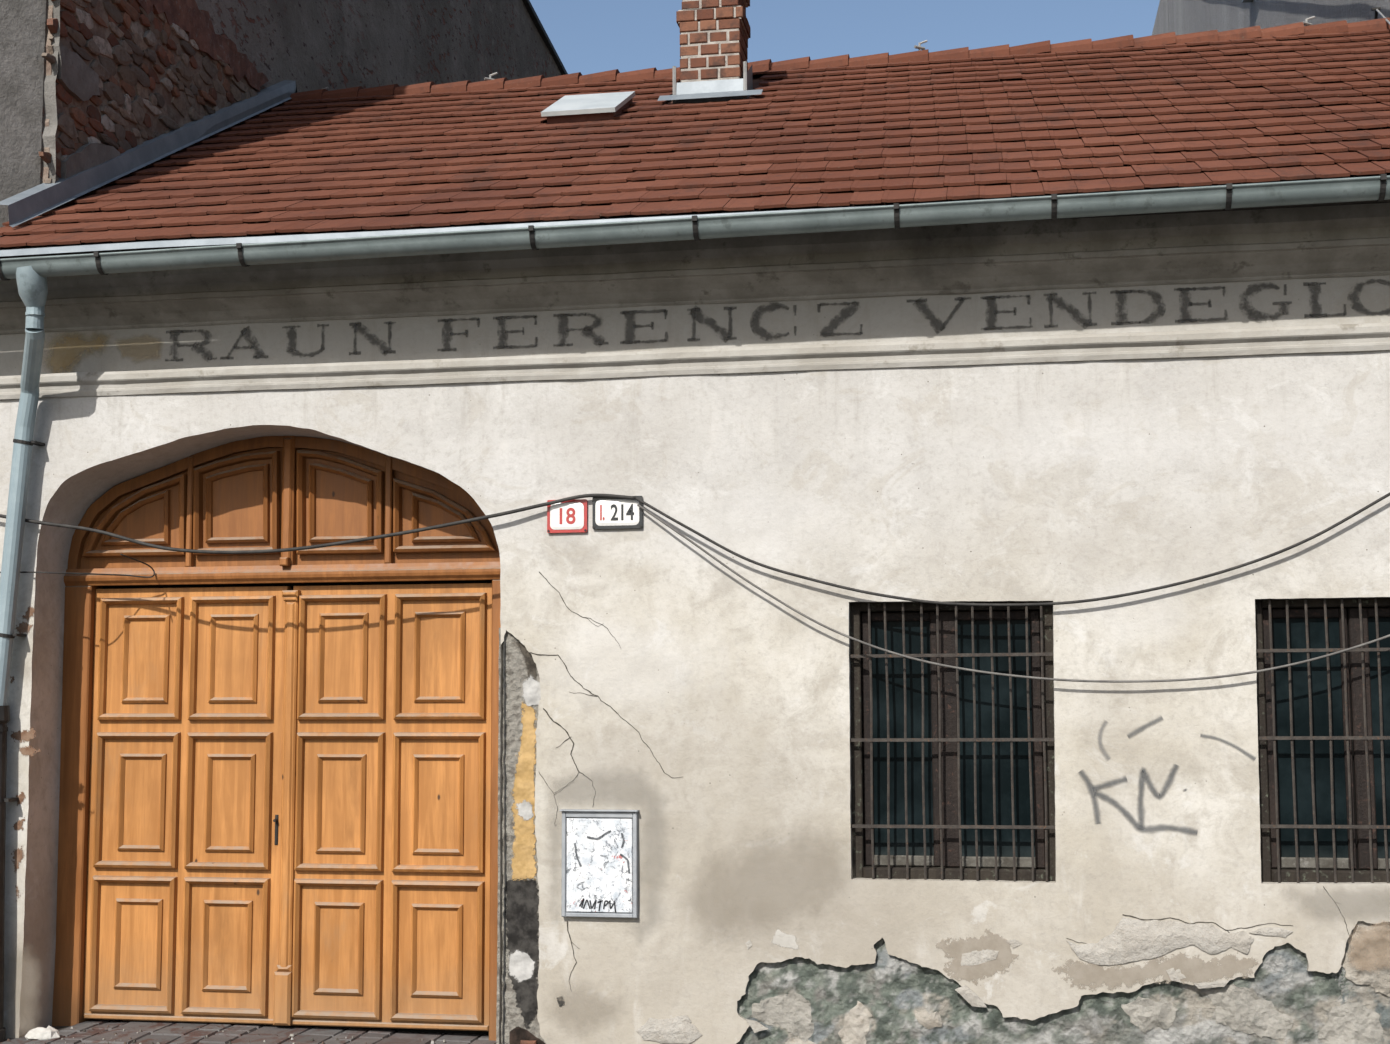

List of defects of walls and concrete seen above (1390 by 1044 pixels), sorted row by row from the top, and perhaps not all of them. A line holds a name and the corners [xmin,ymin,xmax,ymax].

spalling [15,606,35,634]
crack [539,572,621,648]
spalling [11,728,41,756]
crack [528,652,680,821]
spalling [11,792,25,901]
spalling [496,628,546,1044]
crack [567,921,578,992]
spalling [736,921,1390,1044]